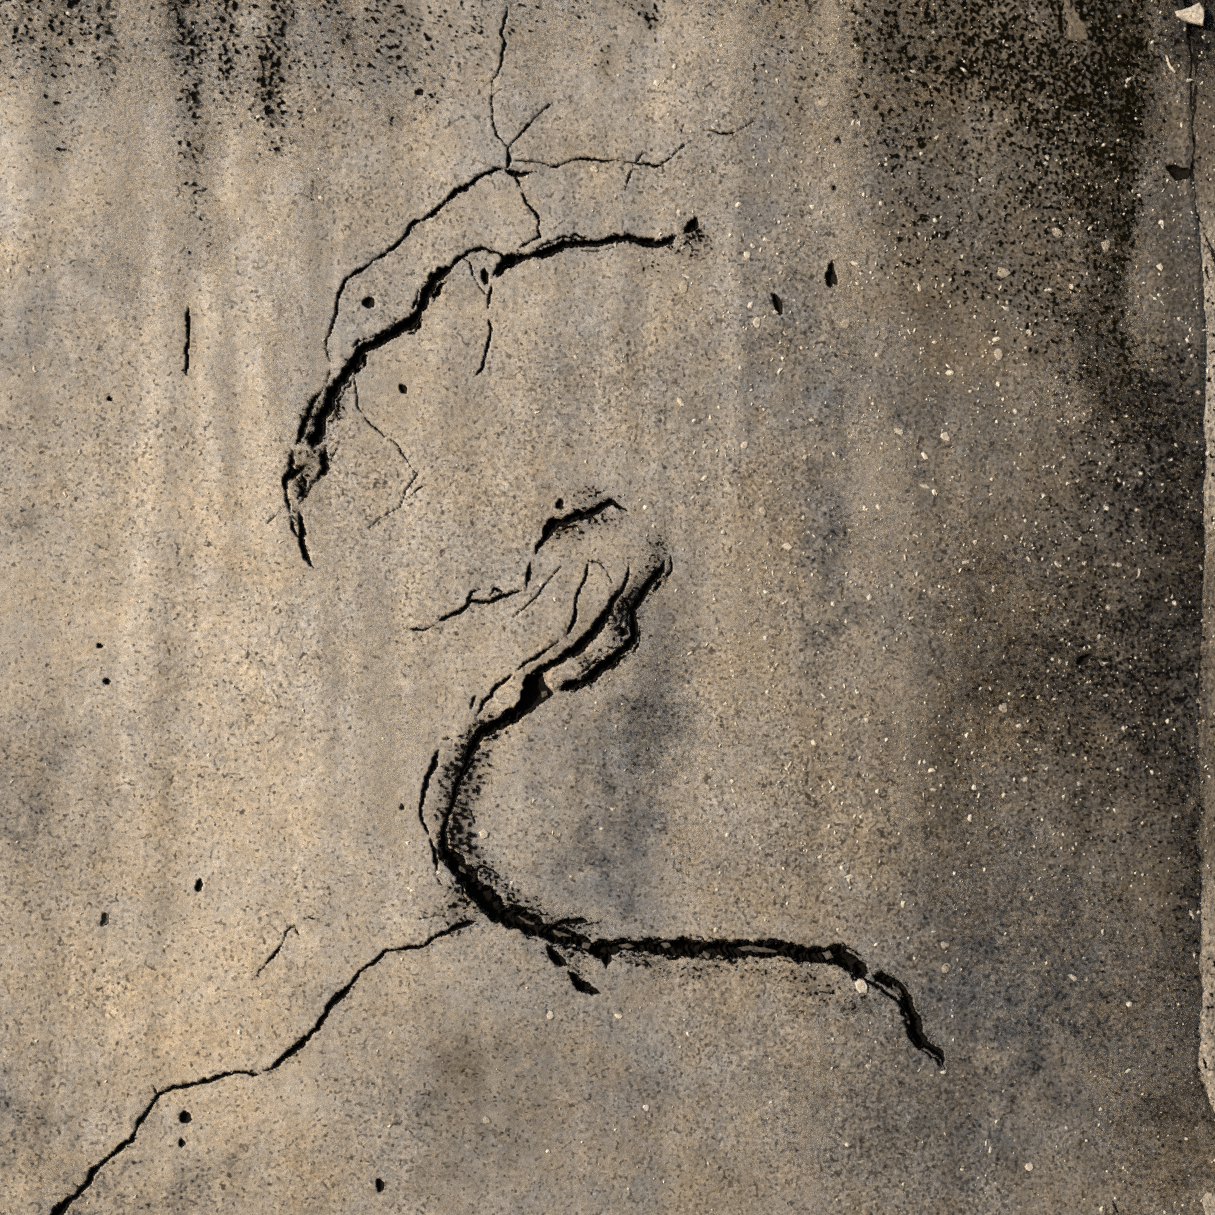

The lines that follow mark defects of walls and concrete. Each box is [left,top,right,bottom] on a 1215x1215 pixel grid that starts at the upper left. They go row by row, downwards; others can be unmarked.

leakage [0,0,312,273]
crack [51,499,945,1215]
crack [267,10,750,567]
leakage [795,368,846,576]
leakage [824,0,851,234]
leakage [846,0,1215,1199]